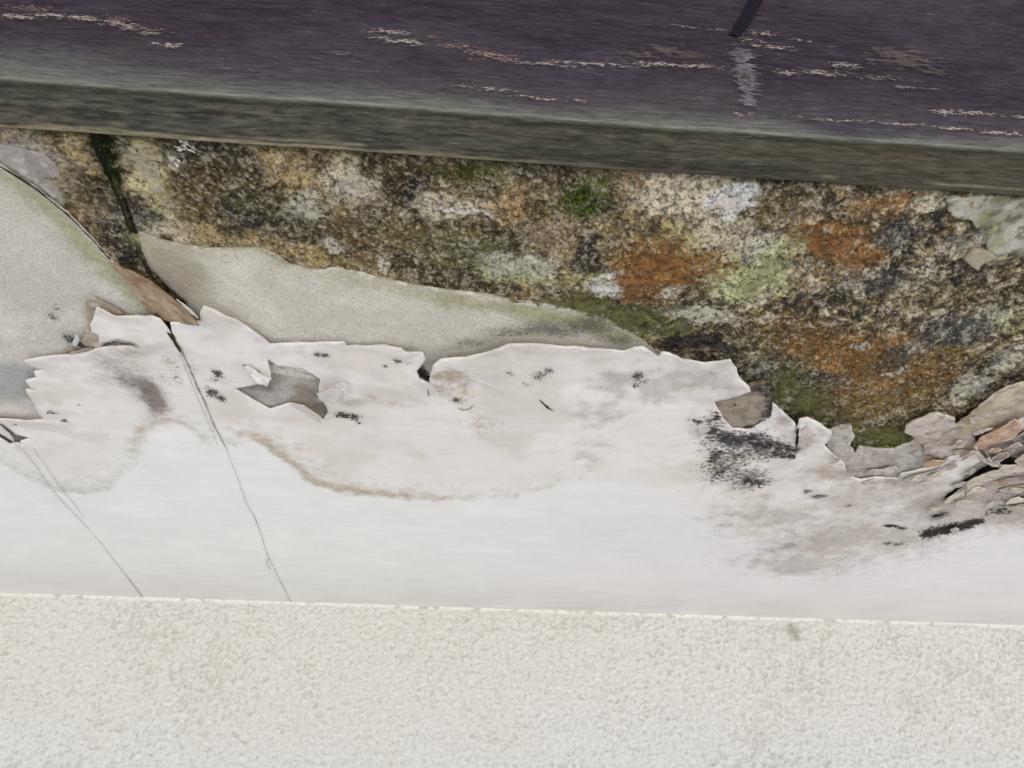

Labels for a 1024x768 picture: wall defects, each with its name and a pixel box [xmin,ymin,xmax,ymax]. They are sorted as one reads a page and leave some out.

crack [89,133,160,284]
spalling [0,127,1024,521]
water stain [490,315,637,344]
water stain [119,354,227,412]
crack [154,313,290,601]
water stain [262,440,406,497]
water stain [314,402,361,424]
water stain [381,359,466,405]
water stain [608,371,713,388]
water stain [688,385,813,490]
crack [12,441,143,598]
water stain [750,477,1024,573]